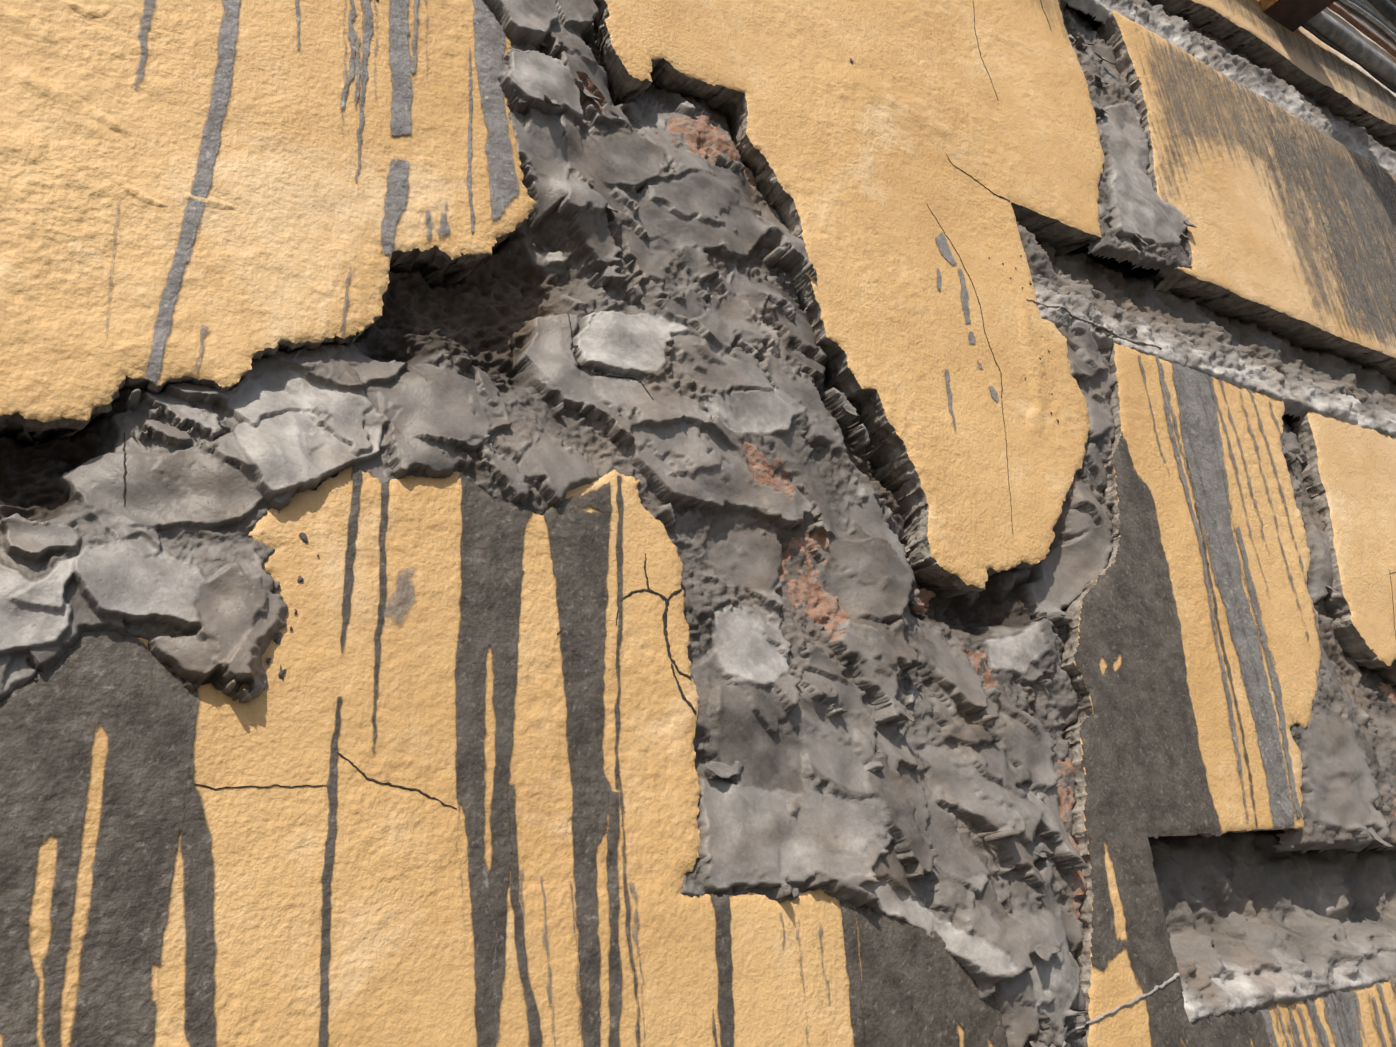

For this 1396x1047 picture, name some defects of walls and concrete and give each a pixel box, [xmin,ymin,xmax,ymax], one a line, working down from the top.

damp [145,0,241,383]
damp [0,629,216,1047]
crack [194,752,457,809]
damp [318,696,342,1047]
damp [340,465,362,653]
damp [372,479,415,750]
damp [454,472,645,1047]
flaking render [0,0,1115,1047]
crack [616,553,697,715]
damp [711,893,734,1047]
damp [1138,355,1323,829]
damp [1074,432,1396,1047]